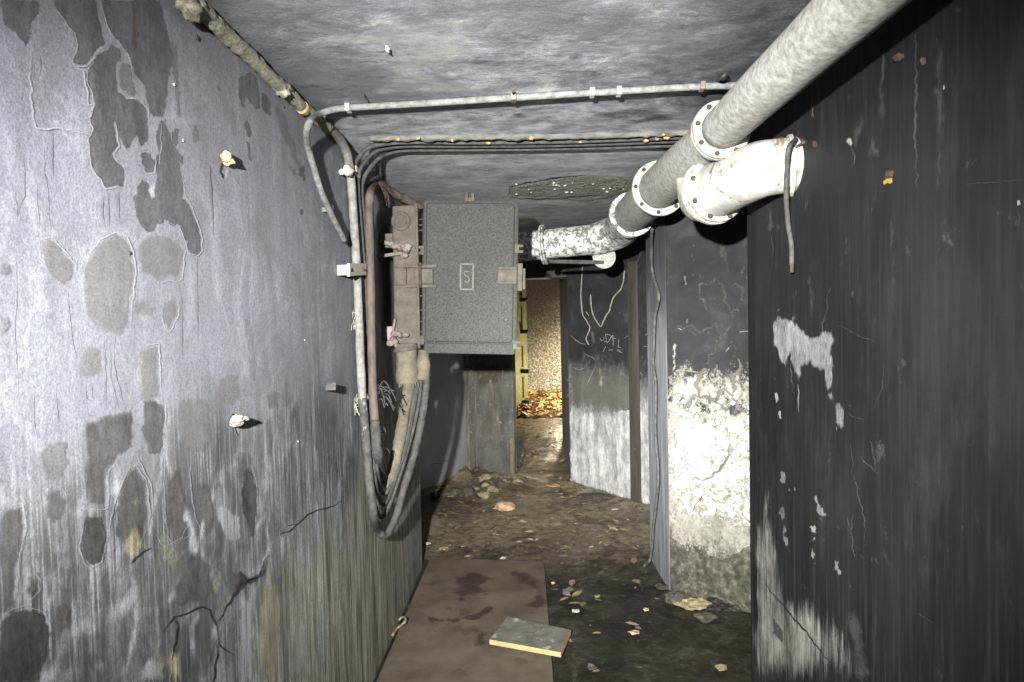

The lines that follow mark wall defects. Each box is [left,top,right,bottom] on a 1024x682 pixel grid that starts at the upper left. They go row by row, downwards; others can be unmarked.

water stain [238,72,305,181]
water stain [1,0,259,568]
peeling [773,287,844,429]
crack [281,501,341,534]
water stain [0,505,69,682]
water stain [142,660,164,679]
water stain [175,555,212,605]
crack [163,555,269,682]
water stain [227,563,279,676]